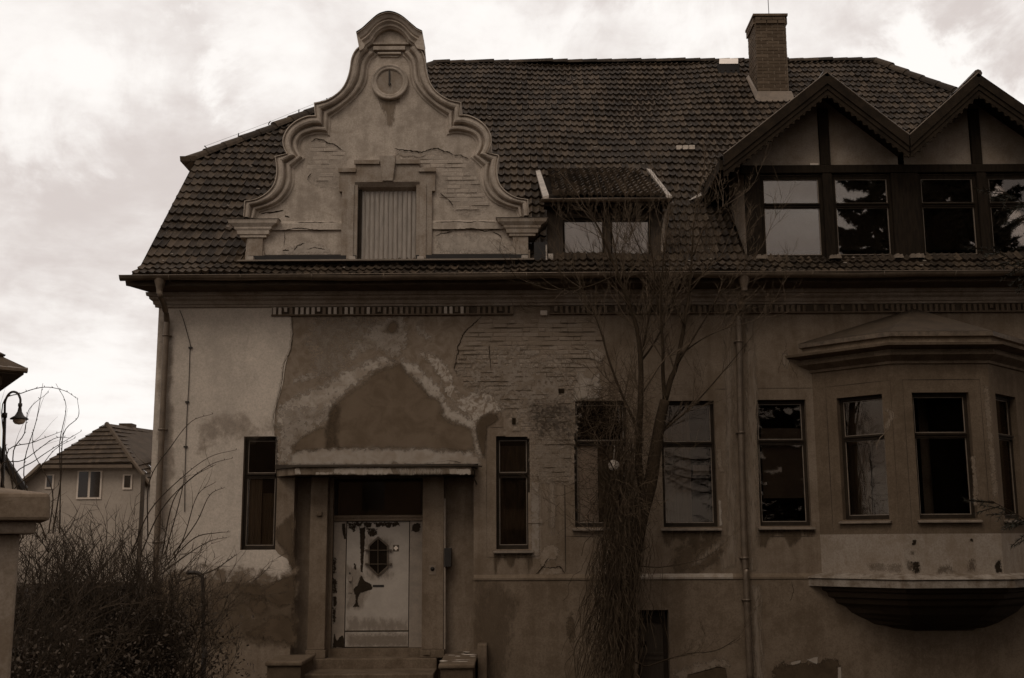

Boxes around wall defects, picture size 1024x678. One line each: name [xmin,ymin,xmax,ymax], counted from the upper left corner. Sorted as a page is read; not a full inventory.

damp [378,98,400,125]
flaking render [305,138,347,189]
flaking render [396,150,489,216]
flaking render [271,313,606,574]
peeling [332,558,344,648]
spalling [772,657,842,678]